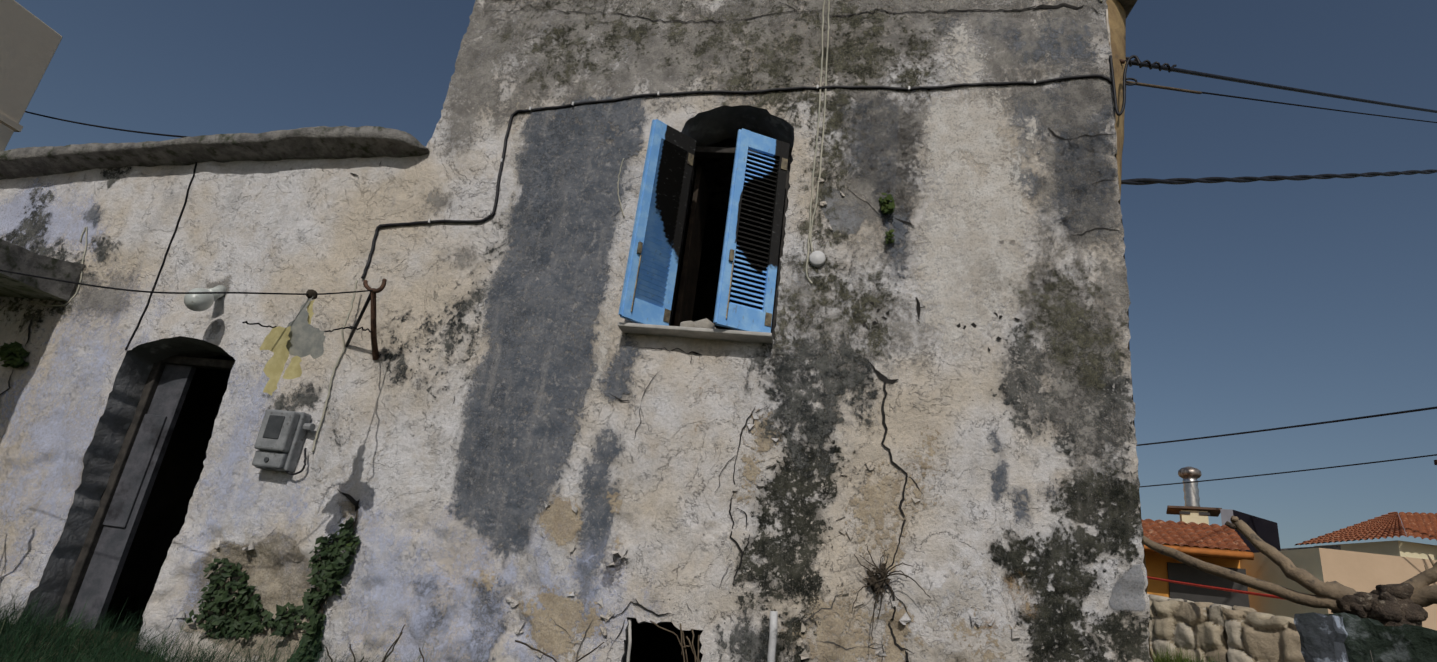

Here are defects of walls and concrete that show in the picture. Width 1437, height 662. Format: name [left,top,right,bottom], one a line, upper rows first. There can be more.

spalling [176,500,362,662]
damp [379,0,1152,662]
crack [790,297,925,662]